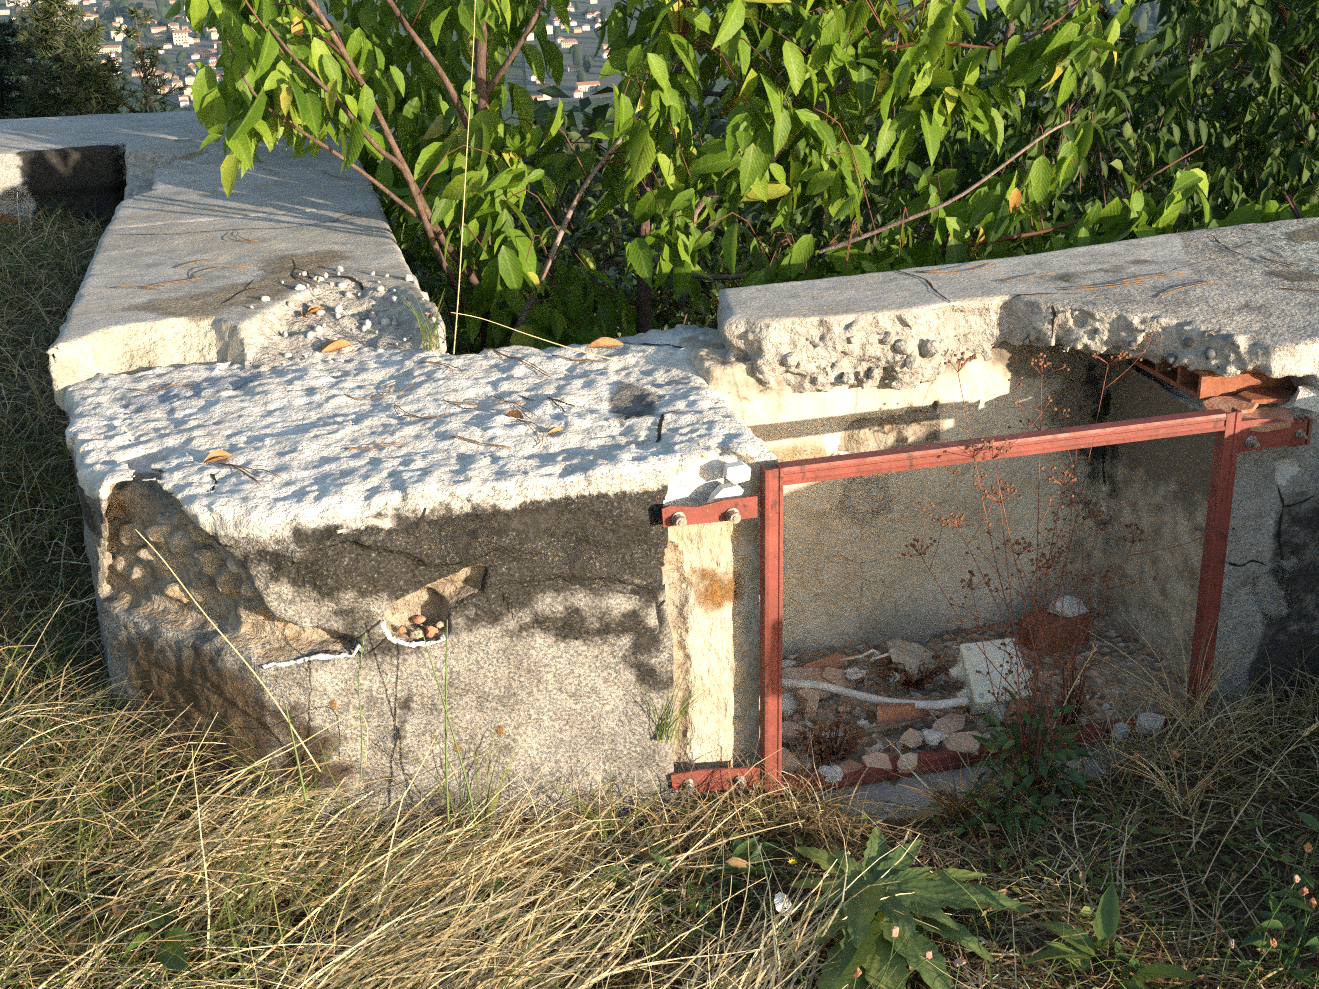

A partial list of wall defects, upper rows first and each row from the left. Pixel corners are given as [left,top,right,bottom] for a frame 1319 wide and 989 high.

crack [893,269,951,304]
spalling [46,278,1265,669]
crack [399,508,665,608]
rust [694,569,741,610]